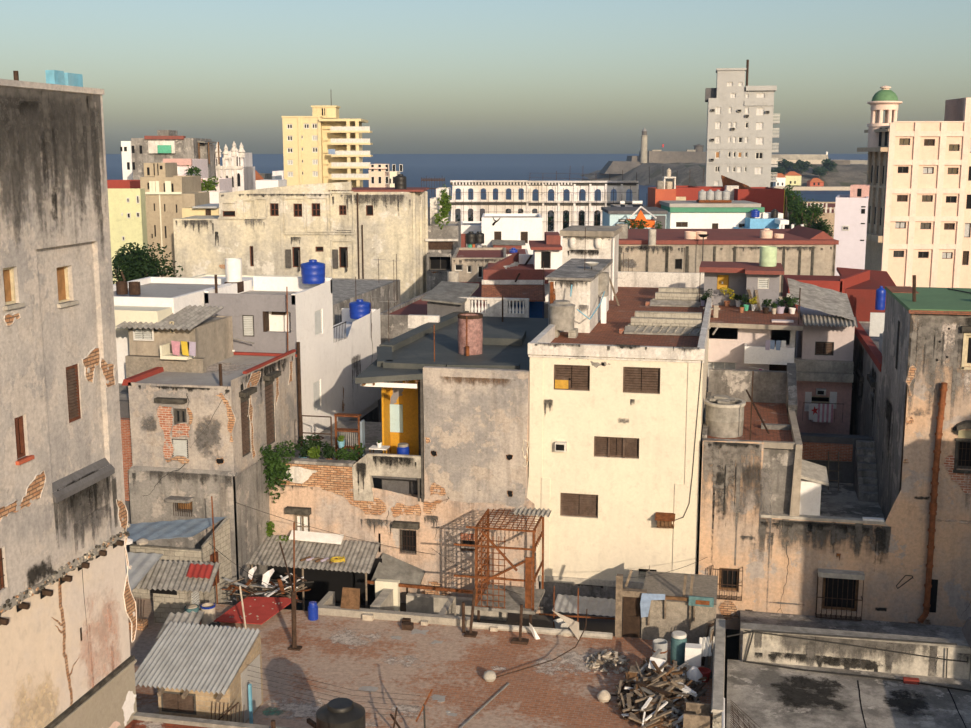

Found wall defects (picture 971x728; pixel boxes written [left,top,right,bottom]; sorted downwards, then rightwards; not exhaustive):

water stain [0,86,104,240]
flaking render [82,347,116,389]
flaking render [156,404,193,465]
water stain [195,419,221,455]
flaking render [216,371,261,459]
flaking render [0,470,46,531]
peeling [281,466,317,484]
flaking render [320,482,448,518]
water stain [702,441,891,567]
flaking render [942,454,971,496]
water stain [754,633,937,716]